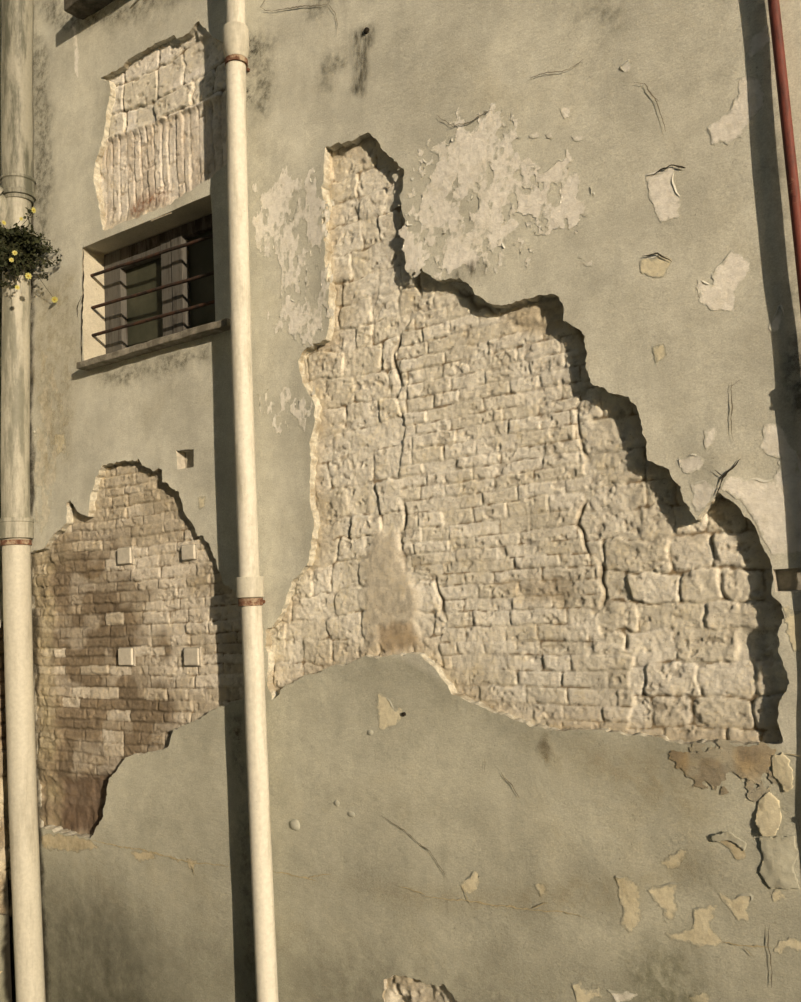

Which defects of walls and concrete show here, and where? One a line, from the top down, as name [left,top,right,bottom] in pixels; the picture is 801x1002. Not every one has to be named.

damp [355,30,371,91]
flaking render [93,21,227,237]
flaking render [251,102,801,902]
flaking render [31,334,244,839]
flaking render [0,621,11,915]
crack [387,819,590,920]
peeling [614,875,682,933]
peeling [665,893,754,948]
flaking render [382,975,457,1002]